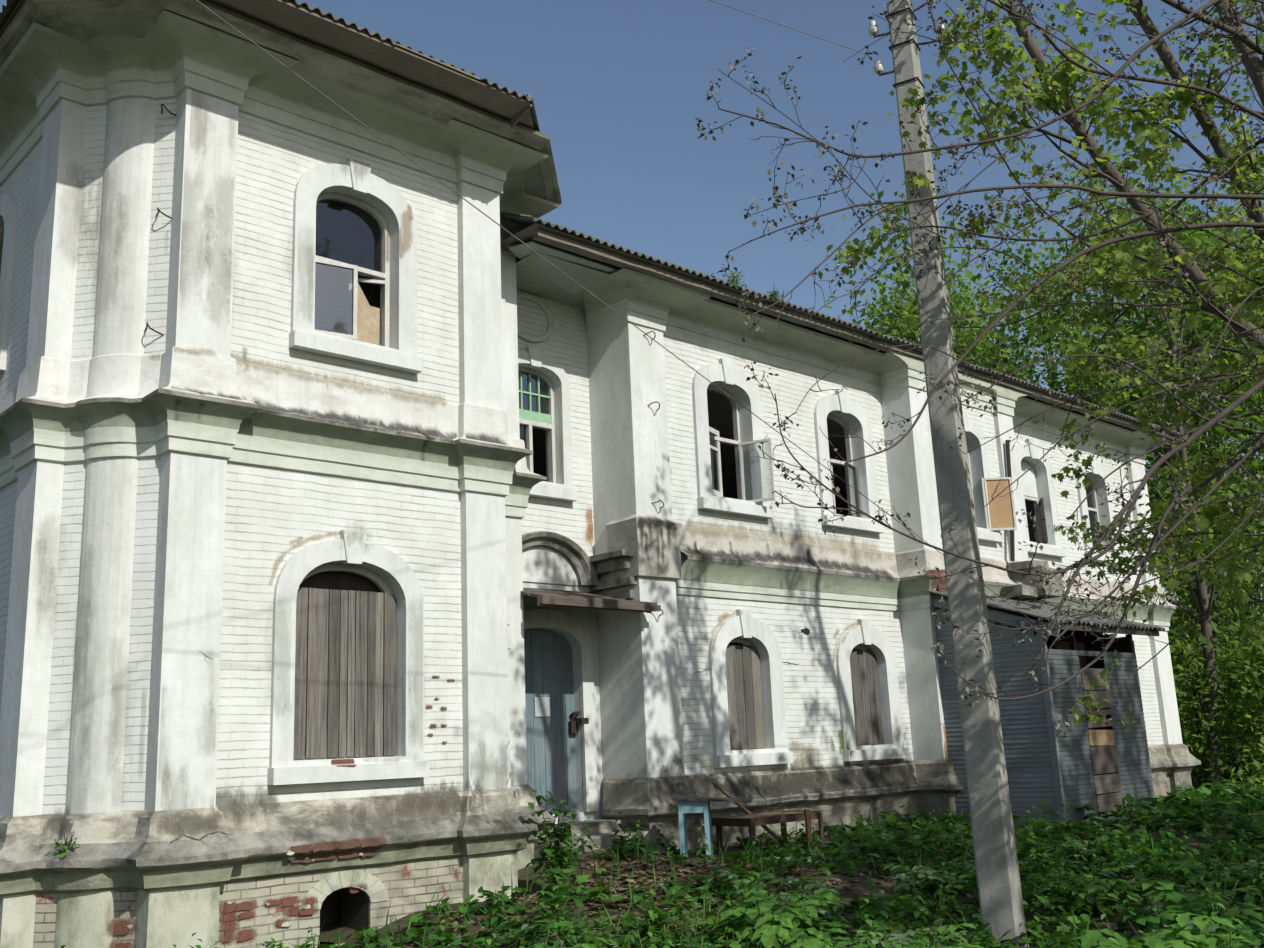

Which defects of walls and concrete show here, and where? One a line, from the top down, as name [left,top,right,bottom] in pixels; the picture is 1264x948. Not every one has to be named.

peeling [387,205,413,259]
damp [637,517,677,558]
damp [681,543,893,579]
damp [43,812,75,835]
damp [160,792,278,833]
damp [329,787,474,829]
flaking render [286,838,381,863]
flaking render [108,920,136,948]
flaking render [219,896,318,943]